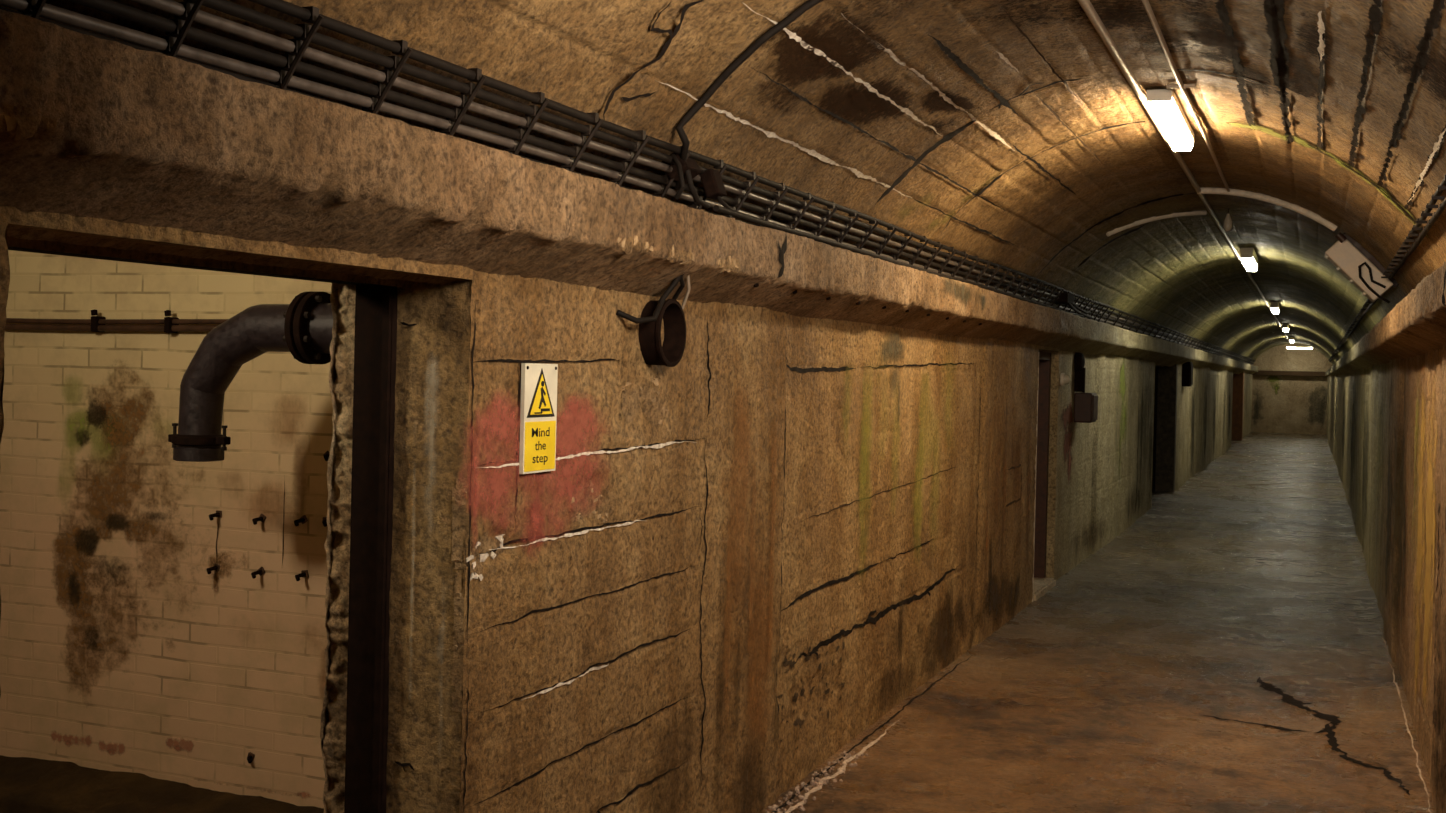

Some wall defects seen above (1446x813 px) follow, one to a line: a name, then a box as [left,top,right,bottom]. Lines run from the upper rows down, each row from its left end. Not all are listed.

leakage [55,371,183,692]
crack [776,351,1022,714]
crack [1204,506,1440,813]